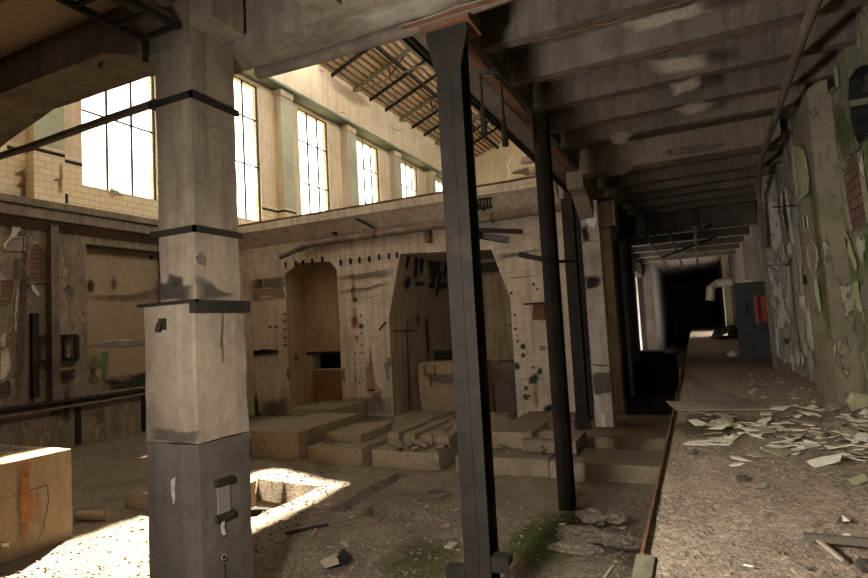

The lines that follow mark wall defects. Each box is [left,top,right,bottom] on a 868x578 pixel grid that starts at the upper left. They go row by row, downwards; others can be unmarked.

spalling [3,226,26,253]
peeling [779,145,821,376]
flaking render [0,278,19,398]
peeling [683,373,868,485]